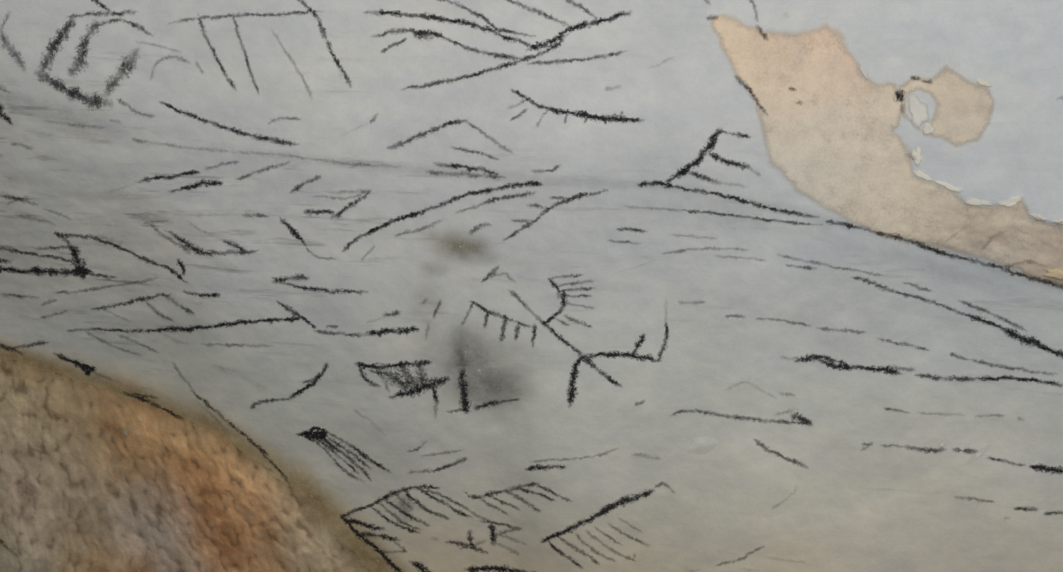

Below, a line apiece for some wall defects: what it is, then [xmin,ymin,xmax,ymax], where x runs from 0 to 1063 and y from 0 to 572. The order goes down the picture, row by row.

spalling [712,15,1063,286]